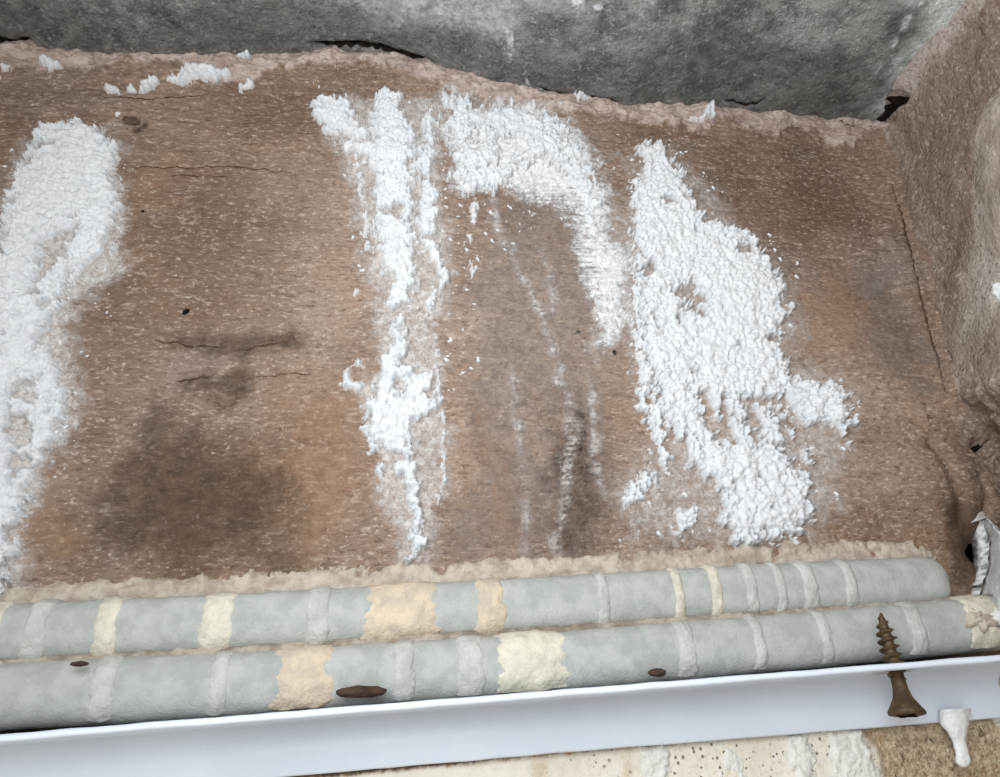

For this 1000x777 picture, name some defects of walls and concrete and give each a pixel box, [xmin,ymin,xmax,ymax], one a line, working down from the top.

damp [0,0,925,565]
damp [0,112,127,659]
crack [971,444,983,453]
damp [84,596,132,722]
damp [197,591,242,716]
damp [267,586,335,710]
damp [360,581,444,701]
damp [456,577,572,696]
damp [662,567,699,677]
damp [697,564,725,616]
damp [731,560,835,670]
damp [894,601,929,655]